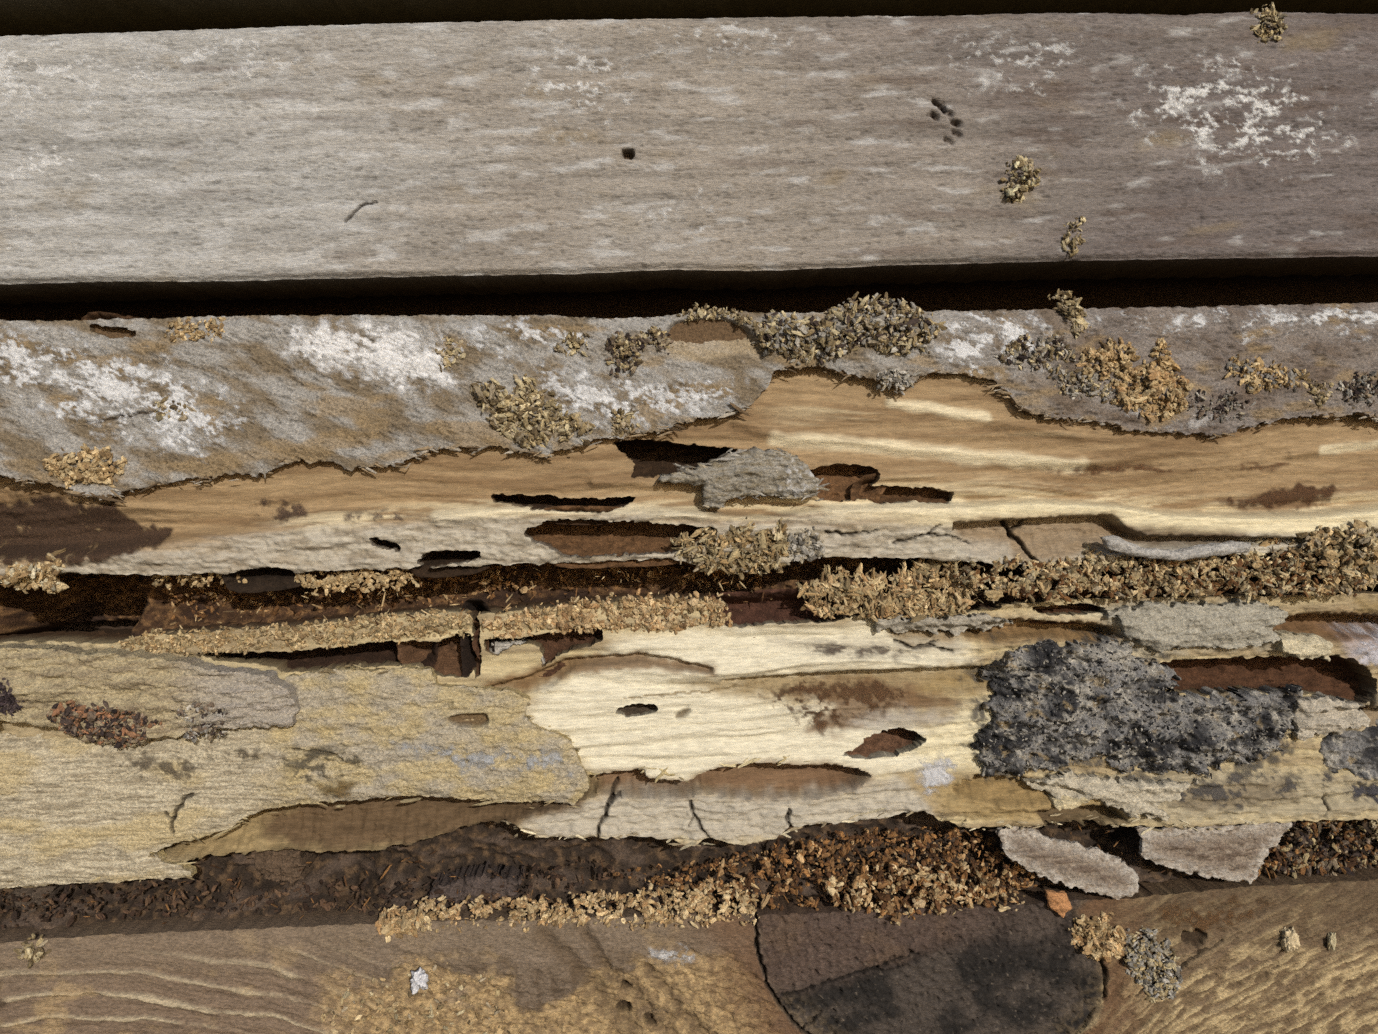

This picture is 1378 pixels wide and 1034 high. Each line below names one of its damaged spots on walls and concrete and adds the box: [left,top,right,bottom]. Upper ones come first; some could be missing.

peeling [657,446,830,509]
peeling [489,638,526,654]
peeling [874,612,1013,636]
peeling [1100,598,1333,661]
peeling [1291,691,1371,741]